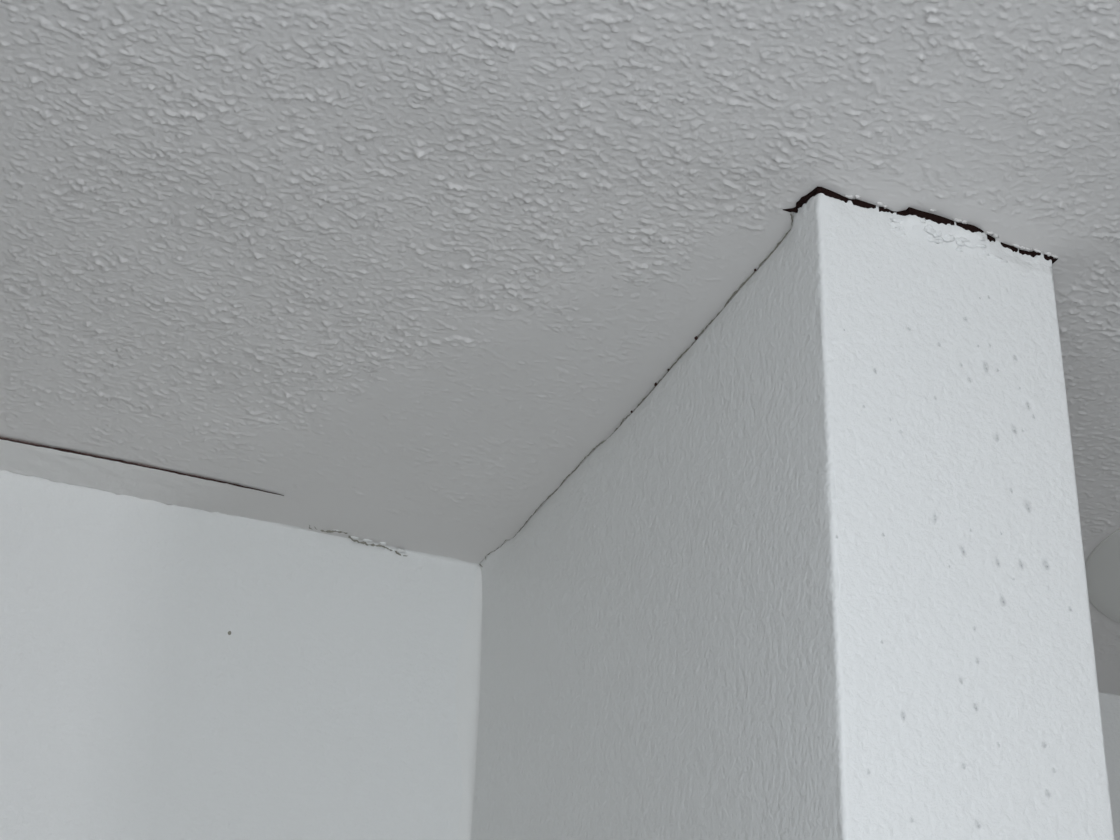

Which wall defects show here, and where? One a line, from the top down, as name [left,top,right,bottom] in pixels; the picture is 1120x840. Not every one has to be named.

crack [480,186,1060,567]
crack [0,437,284,496]
crack [309,525,406,556]